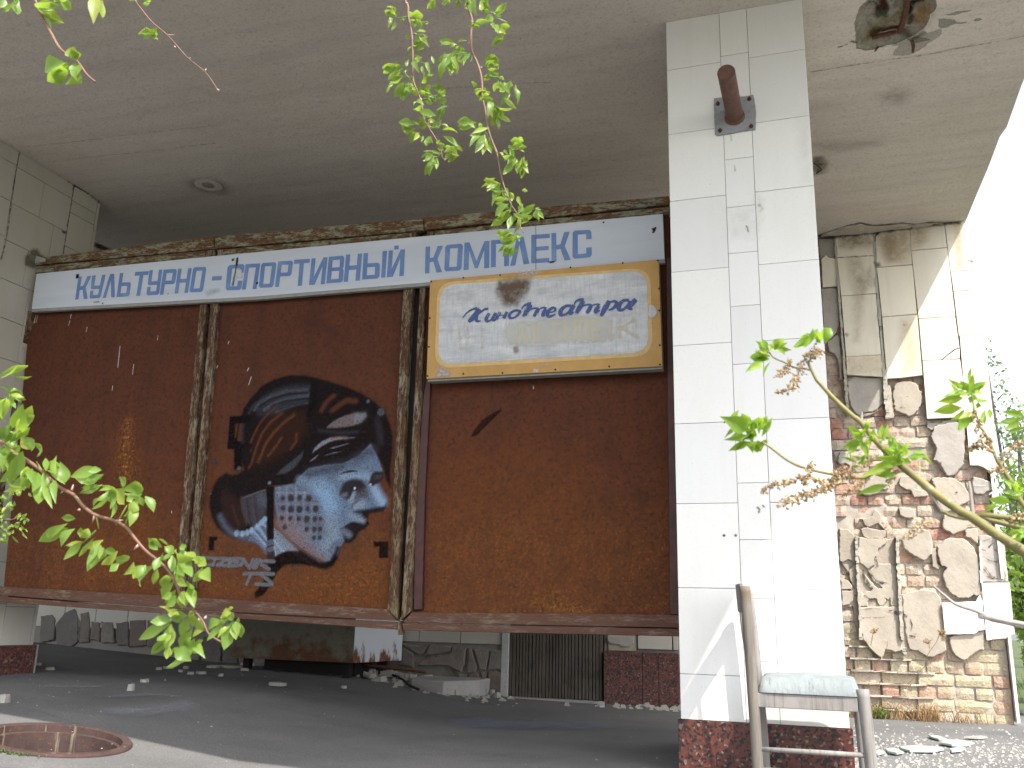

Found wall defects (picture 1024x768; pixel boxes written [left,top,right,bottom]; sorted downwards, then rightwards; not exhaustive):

spalling [854,0,982,56]
corrosion [4,289,403,609]
corrosion [413,217,674,615]
spalling [960,334,997,470]
spalling [942,583,1015,640]